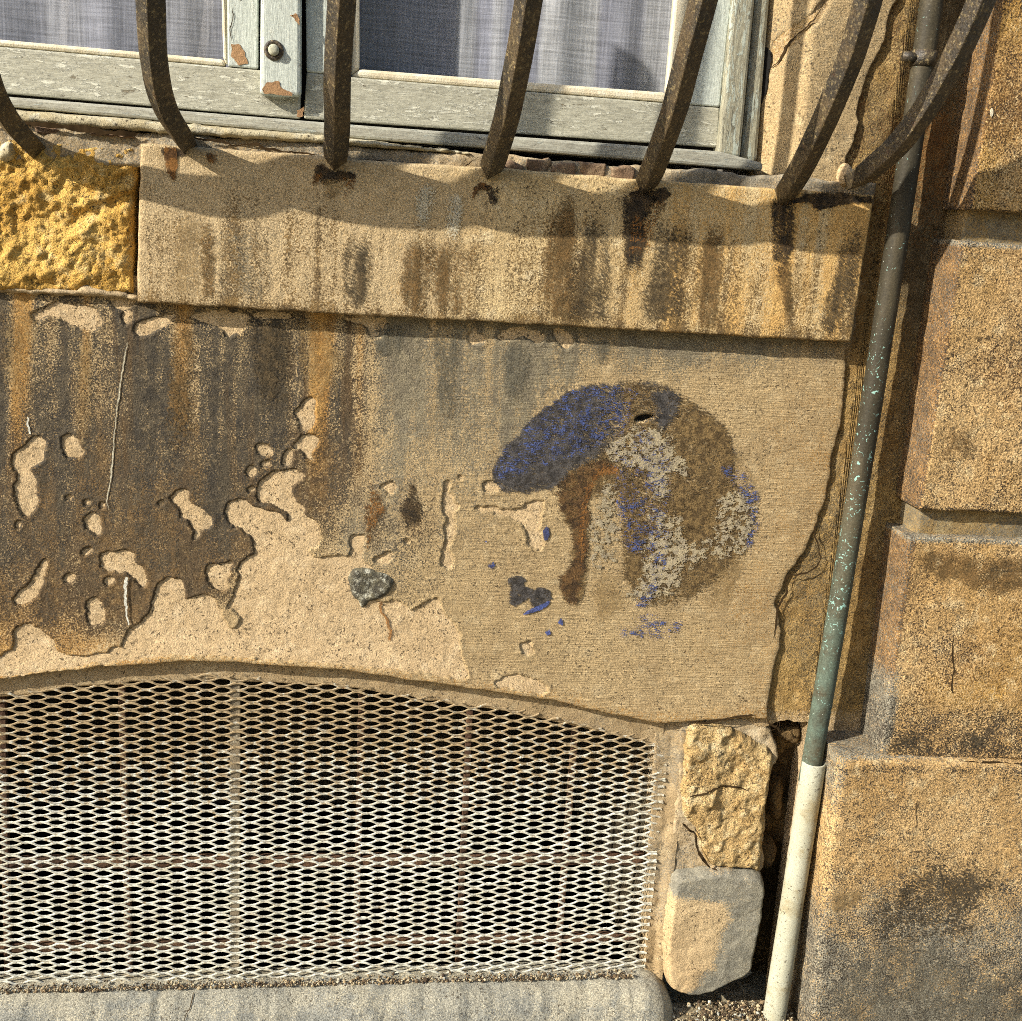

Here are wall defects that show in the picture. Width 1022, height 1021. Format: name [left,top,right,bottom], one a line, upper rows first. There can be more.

crack [770,1,825,68]
corrosion [161,146,186,180]
corrosion [618,187,672,273]
corrosion [771,191,873,325]
peeling [32,301,102,330]
peeling [109,298,176,337]
leakage [166,327,196,450]
leakage [248,323,293,417]
peeling [0,397,468,679]
crack [689,785,746,797]
crack [683,823,735,872]
leakage [832,846,1022,1021]